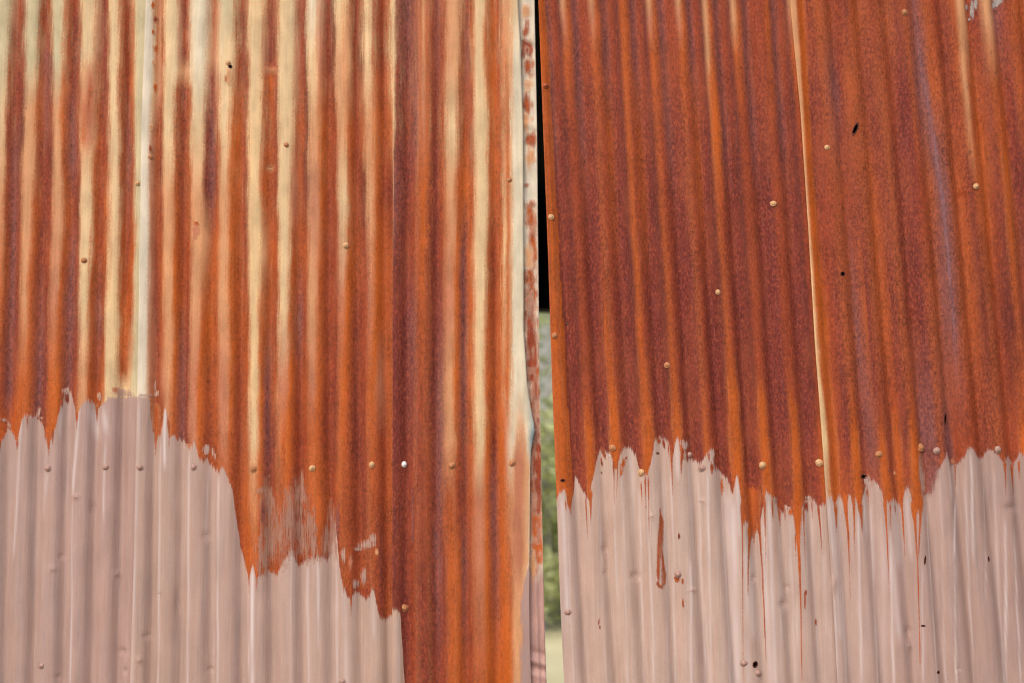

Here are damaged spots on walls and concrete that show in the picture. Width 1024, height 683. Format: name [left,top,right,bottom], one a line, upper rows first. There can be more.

rust [709,58,723,197]
peeling [97,382,159,401]
rust [0,0,572,683]
peeling [255,470,378,589]
rust [602,293,627,480]
rust [638,338,684,589]
peeling [708,448,724,495]
rust [726,350,822,674]
peeling [773,496,813,515]
rust [796,0,869,572]
rust [878,410,923,662]
peeling [919,460,937,505]